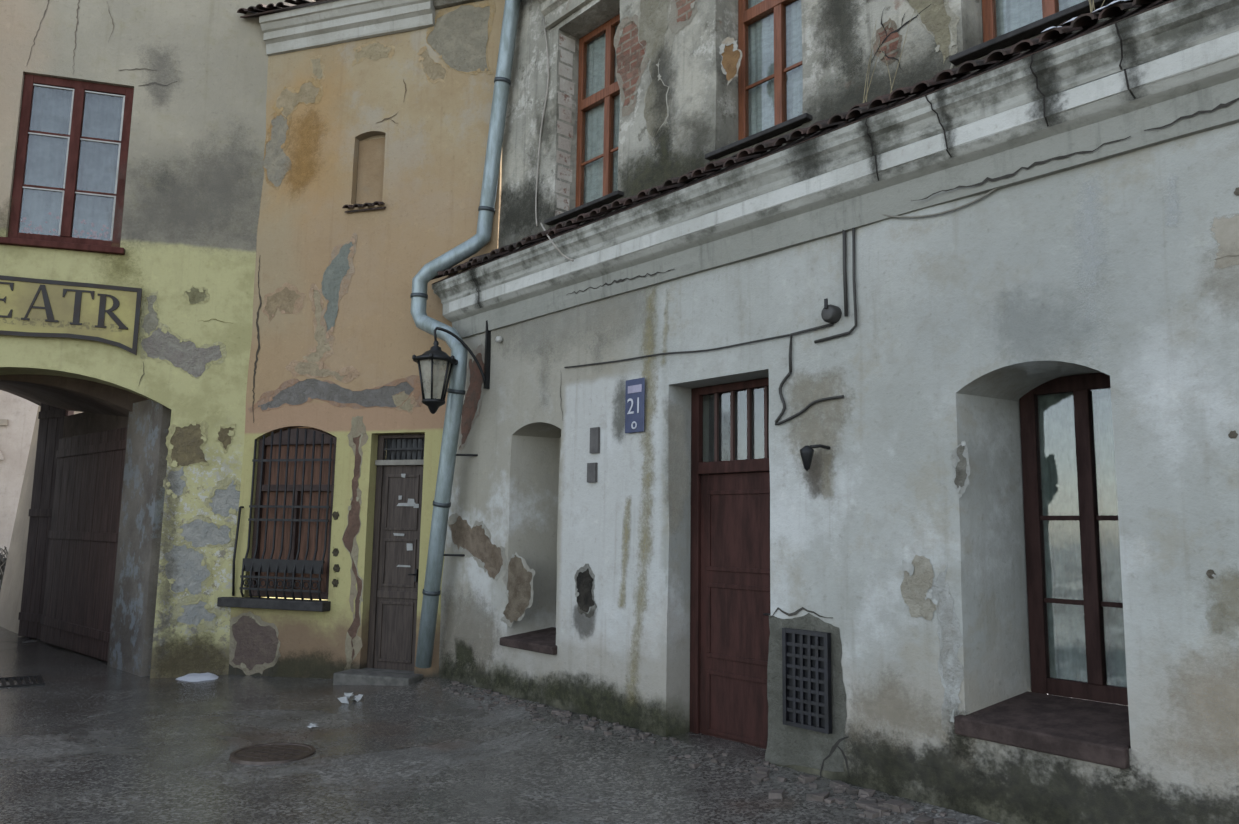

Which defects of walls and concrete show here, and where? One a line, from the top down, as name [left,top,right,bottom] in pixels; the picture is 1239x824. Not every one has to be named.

crack [27,0,114,73]
peeling [614,0,698,147]
crack [1030,54,1049,127]
crack [1115,22,1135,98]
crack [913,95,1239,201]
crack [201,258,262,423]
spalling [163,420,236,505]
spalling [332,416,369,670]
peeling [448,513,535,628]
spalling [574,564,597,616]
water stain [614,384,625,437]
water stain [620,291,666,706]